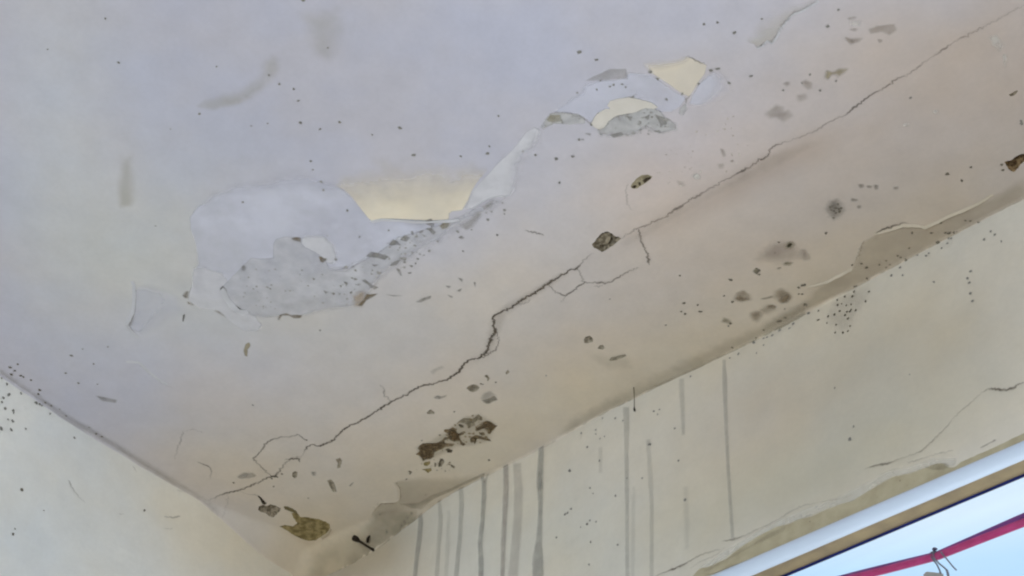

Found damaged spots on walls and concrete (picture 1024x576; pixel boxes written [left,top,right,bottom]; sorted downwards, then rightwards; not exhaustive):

peeling [185,58,715,331]
crack [224,266,621,500]